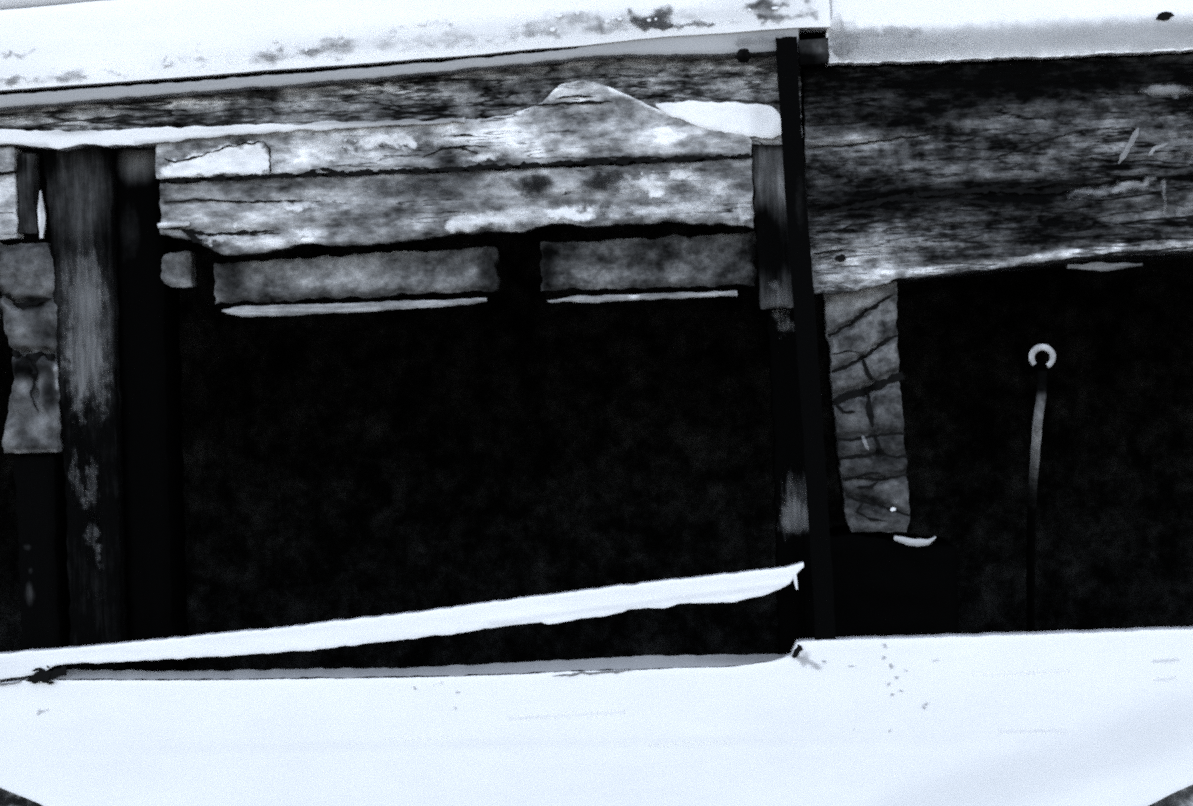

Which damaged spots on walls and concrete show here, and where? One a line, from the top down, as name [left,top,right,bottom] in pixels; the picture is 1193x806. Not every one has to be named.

peeling [747,0,785,20]